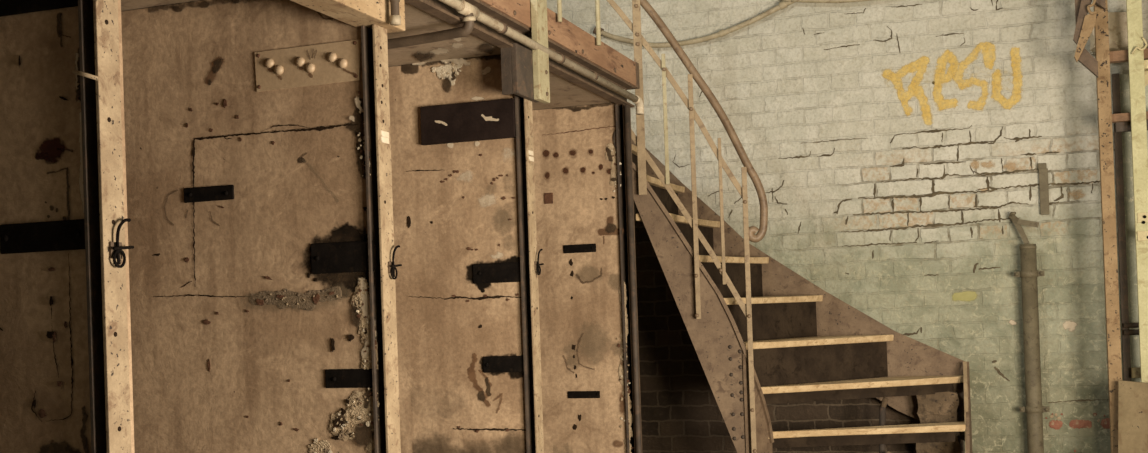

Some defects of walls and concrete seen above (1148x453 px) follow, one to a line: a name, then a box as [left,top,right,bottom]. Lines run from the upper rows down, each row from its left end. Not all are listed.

peeling [412,38,493,92]
spalling [246,273,378,370]
peeling [307,387,379,453]
water stain [414,437,524,453]